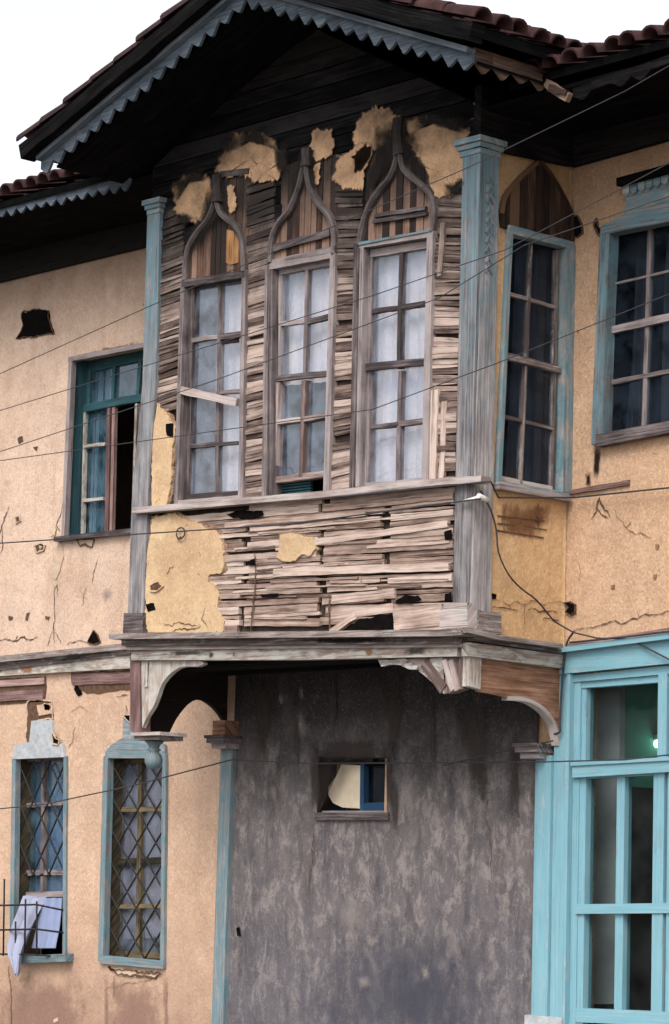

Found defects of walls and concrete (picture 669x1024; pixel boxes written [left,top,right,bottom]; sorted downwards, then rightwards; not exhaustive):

flaking render [149,141,462,632]
leakage [502,507,545,525]
flaking render [146,579,164,612]
crack [494,600,669,631]
flaking render [0,676,60,745]